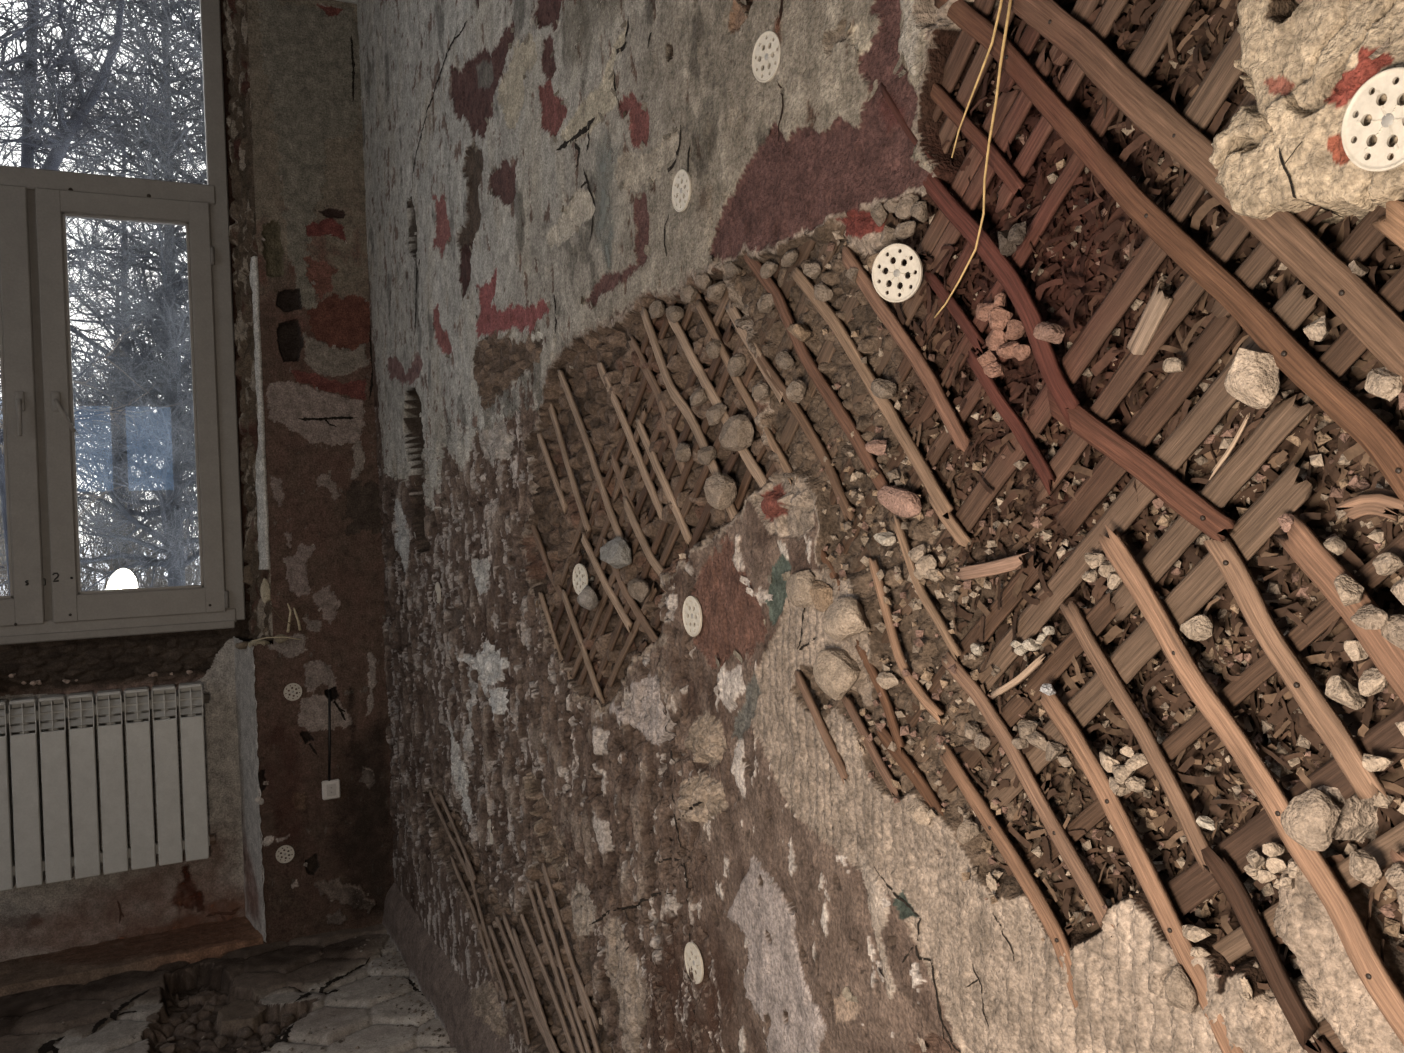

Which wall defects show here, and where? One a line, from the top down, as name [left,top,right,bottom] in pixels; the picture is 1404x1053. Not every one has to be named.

peeling [1322,38,1394,110]
peeling [1326,135,1350,168]
spalling [1019,171,1141,361]
spalling [936,335,1045,512]
spalling [1221,413,1366,575]
spalling [924,456,1094,674]
spalling [987,582,1121,712]
spalling [1036,749,1092,826]
spalling [1127,777,1196,885]
crack [38,990,148,1053]
crack [274,958,370,1043]
peeling [727,856,860,1053]